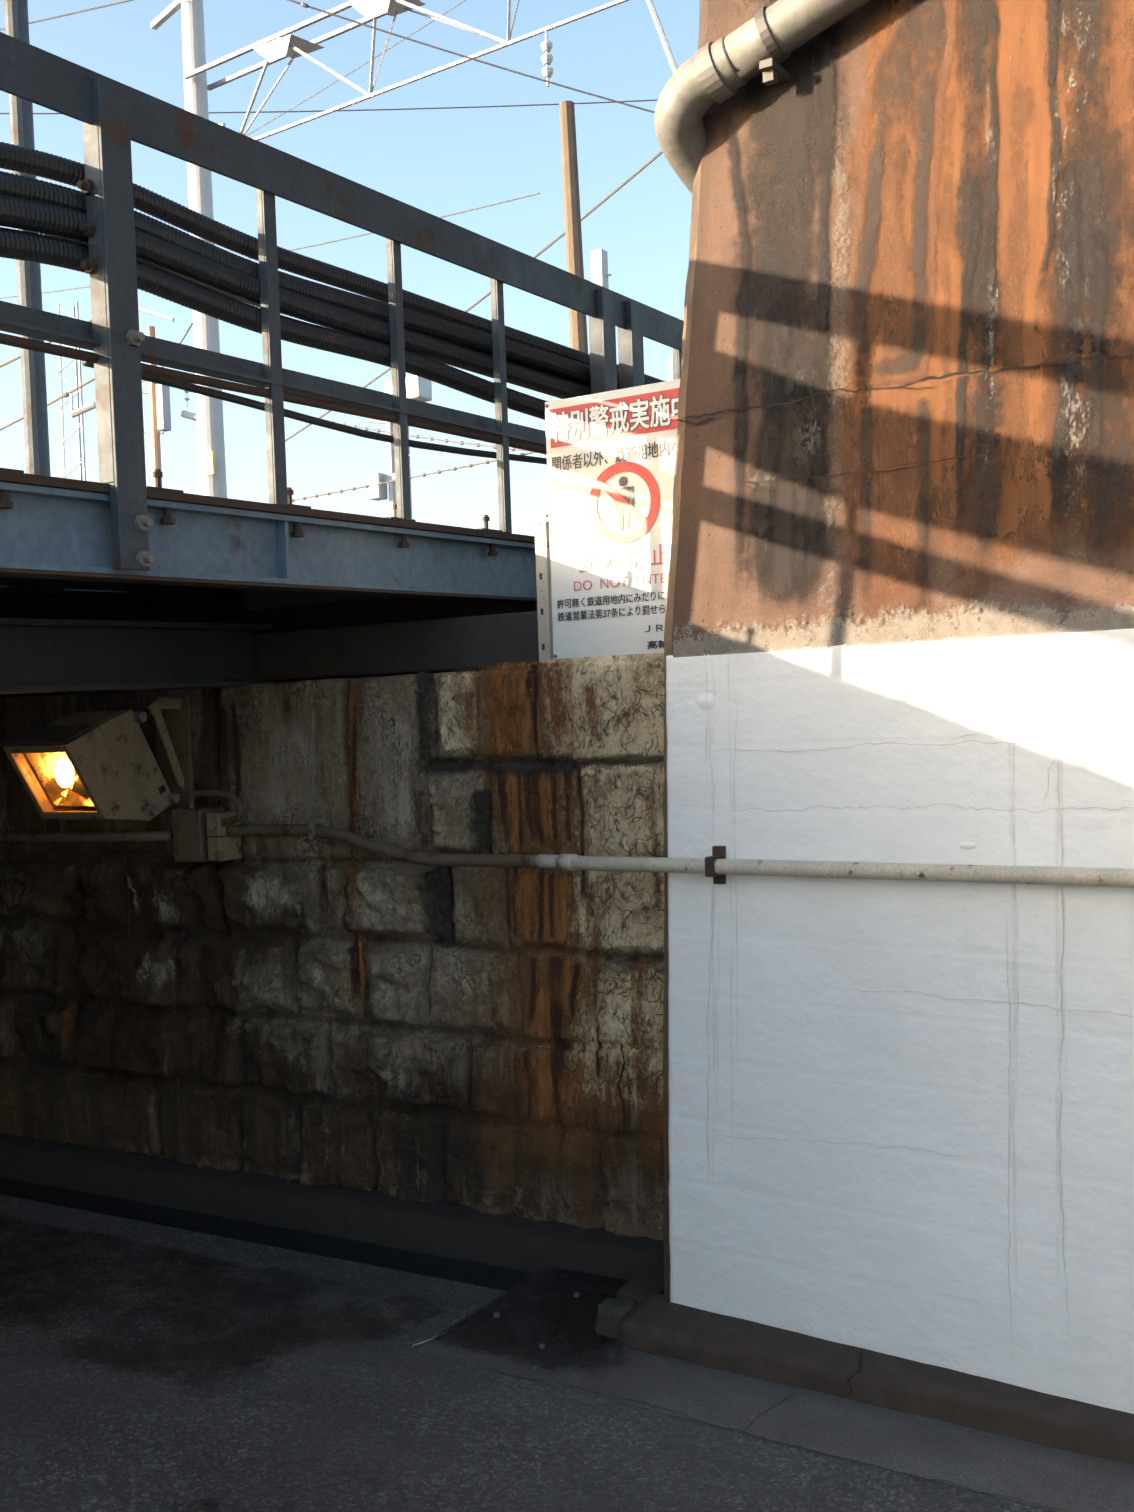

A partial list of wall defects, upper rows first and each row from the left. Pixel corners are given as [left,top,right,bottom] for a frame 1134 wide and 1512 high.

leakage [728,20,843,602]
crack [673,355,1134,425]
leakage [955,0,1003,549]
rust [831,0,1134,615]
leakage [1039,0,1134,547]
rust [342,685,369,1002]
rust [454,661,664,1175]